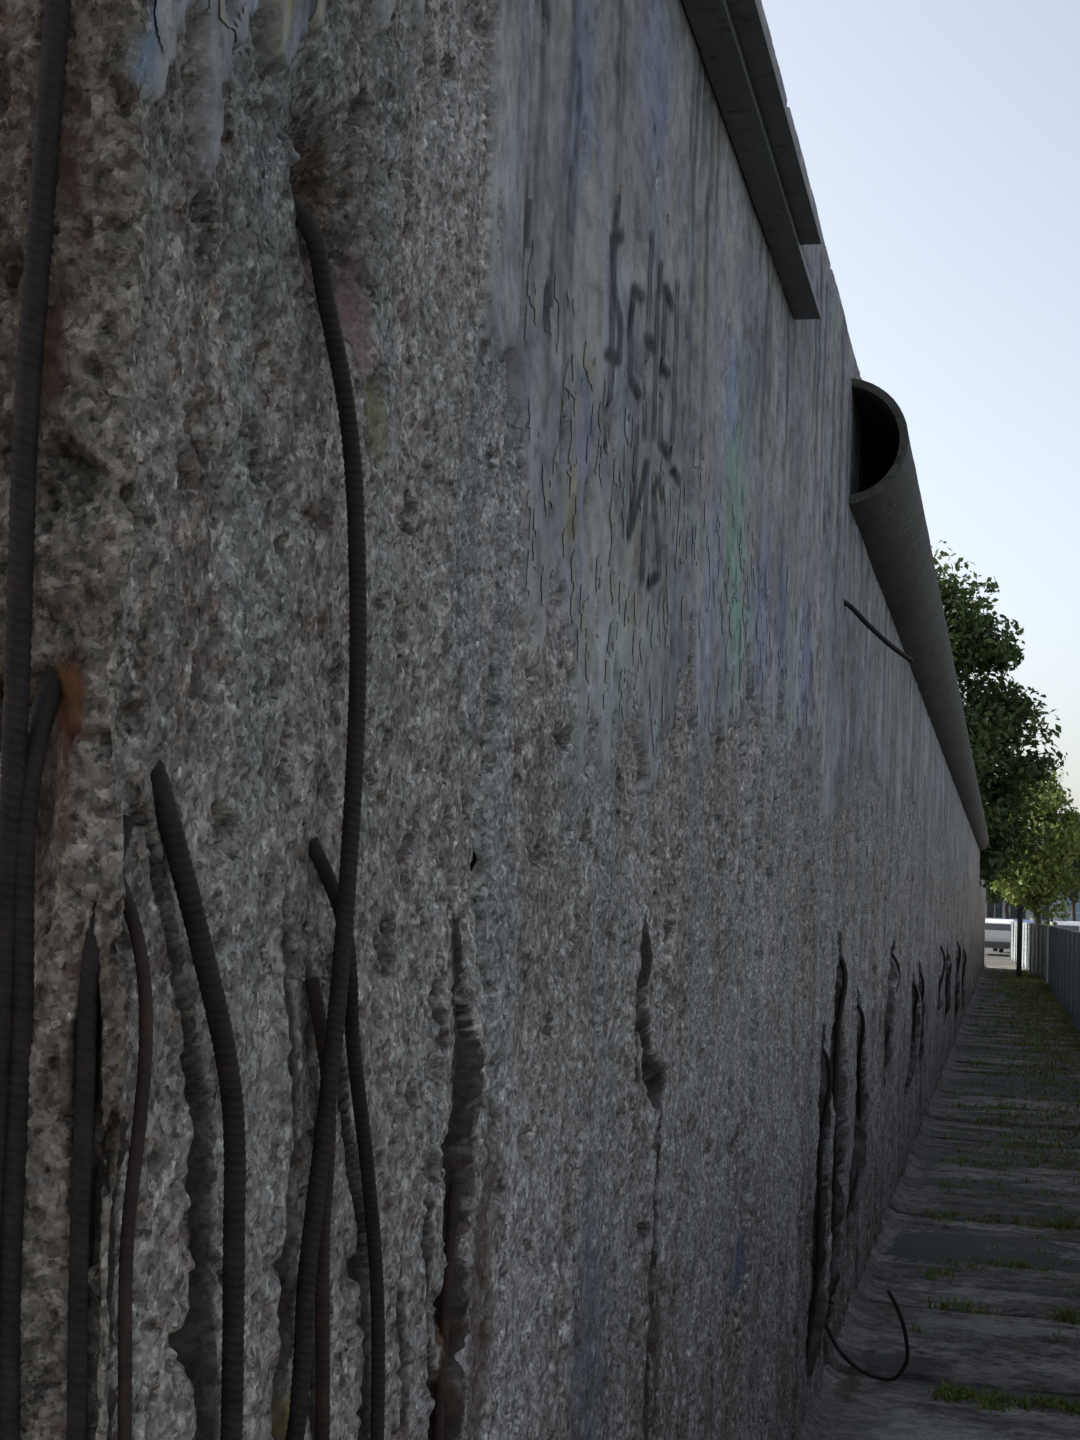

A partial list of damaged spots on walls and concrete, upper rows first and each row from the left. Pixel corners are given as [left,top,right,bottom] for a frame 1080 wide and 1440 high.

peeling [155,0,172,54]
spalling [834,585,914,708]
crack [69,901,130,1440]
crack [132,799,221,1440]
crack [271,880,487,1440]
crack [634,912,668,1440]
crack [805,930,967,1408]
spalling [971,919,979,984]
spalling [973,878,986,978]